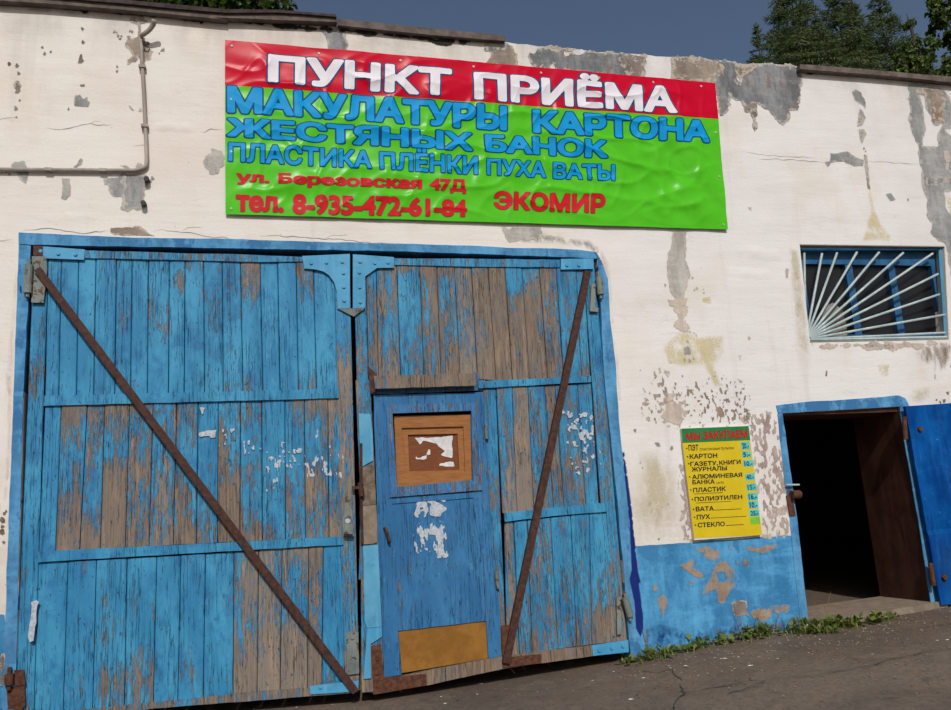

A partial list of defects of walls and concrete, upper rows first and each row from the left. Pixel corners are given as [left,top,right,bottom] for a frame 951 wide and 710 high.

peeling [67,84,90,110]
peeling [113,16,165,73]
peeling [484,42,647,77]
peeling [670,55,803,130]
peeling [103,173,155,212]
peeling [203,148,225,175]
peeling [825,89,870,189]
peeling [908,82,951,268]
peeling [664,231,705,363]
peeling [640,368,790,622]